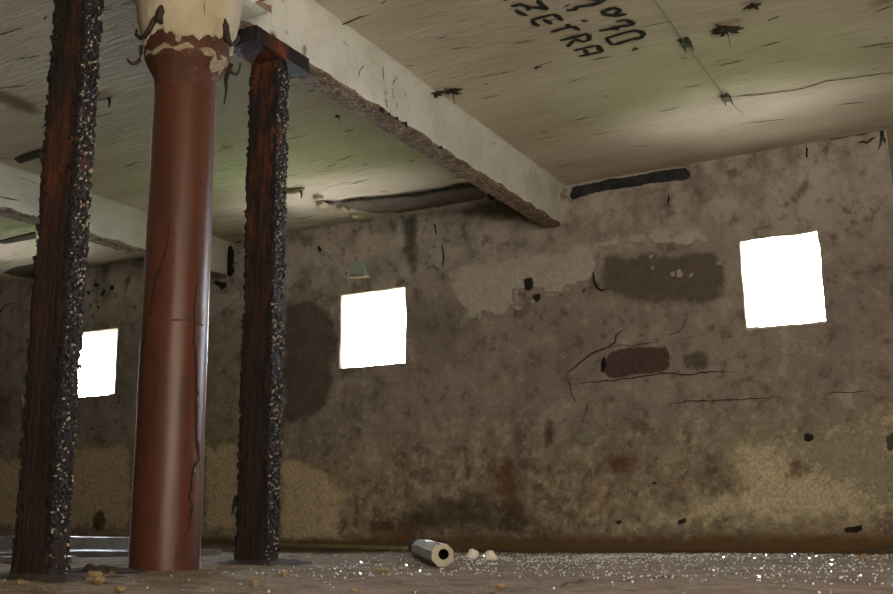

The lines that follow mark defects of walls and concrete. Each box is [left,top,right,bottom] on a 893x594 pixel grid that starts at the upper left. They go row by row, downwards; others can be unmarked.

peeling [145,33,228,77]
crack [715,68,887,98]
spalling [300,63,561,227]
peeling [448,224,724,320]
crack [135,216,205,543]
crack [565,319,731,420]
crack [665,396,777,407]